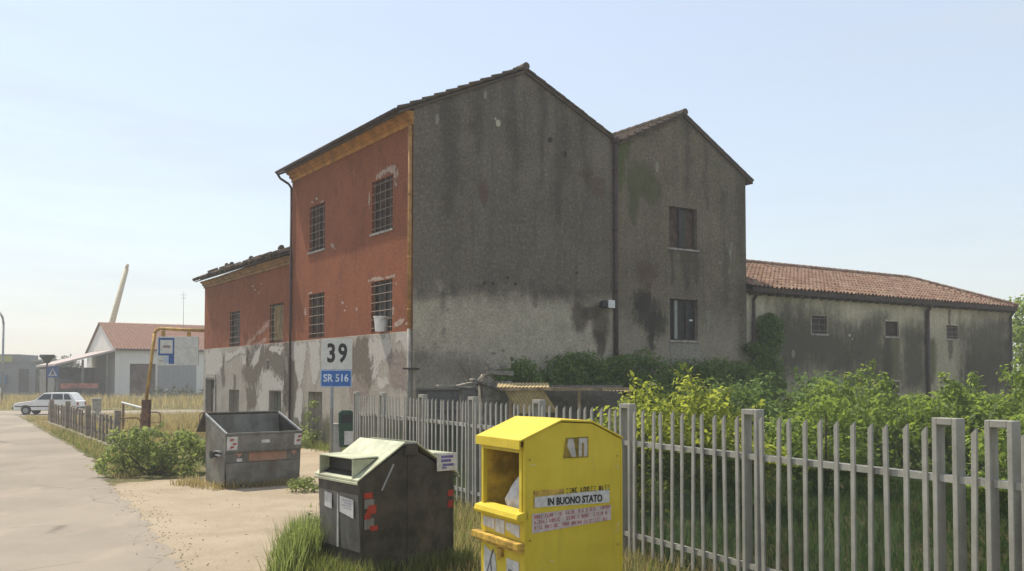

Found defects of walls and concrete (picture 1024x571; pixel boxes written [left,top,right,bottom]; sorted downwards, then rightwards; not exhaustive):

peeling [376,164,399,187]
flaking render [204,320,321,441]
flaking render [349,307,407,406]
water stain [573,304,607,355]
water stain [778,302,935,390]
water stain [960,319,1009,394]